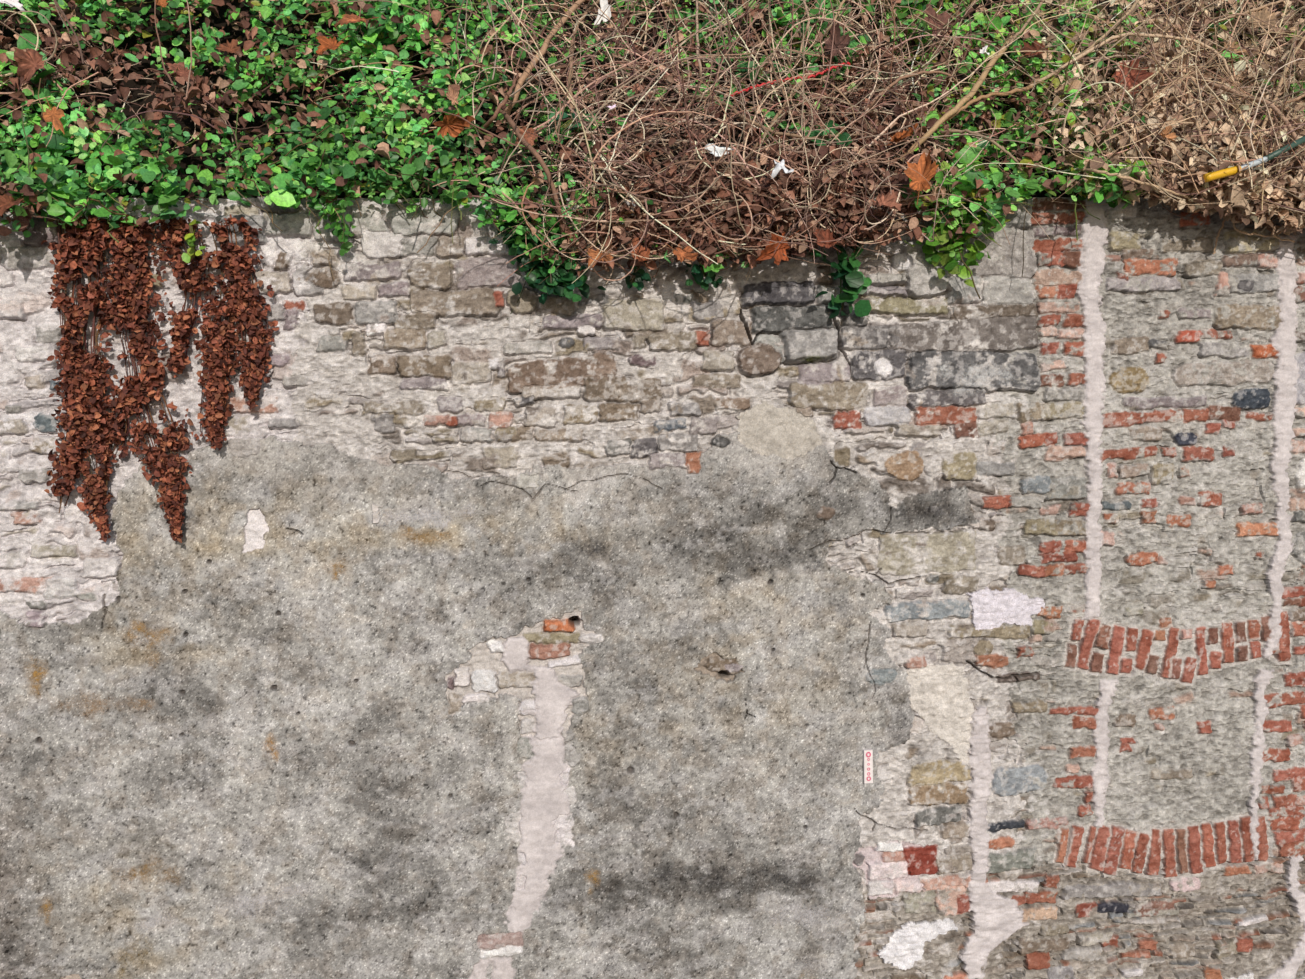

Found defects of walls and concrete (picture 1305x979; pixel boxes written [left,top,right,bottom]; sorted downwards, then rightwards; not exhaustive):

flaking render [736,400,824,459]
crack [445,469,663,502]
flaking render [243,507,269,552]
crack [810,506,974,550]
crack [849,568,922,586]
flaking render [967,586,1045,630]
spalling [695,652,745,682]
spalling [445,608,606,848]
flaking render [906,662,975,763]
spalling [502,808,529,890]
spalling [852,839,941,899]
flaking render [877,917,958,970]